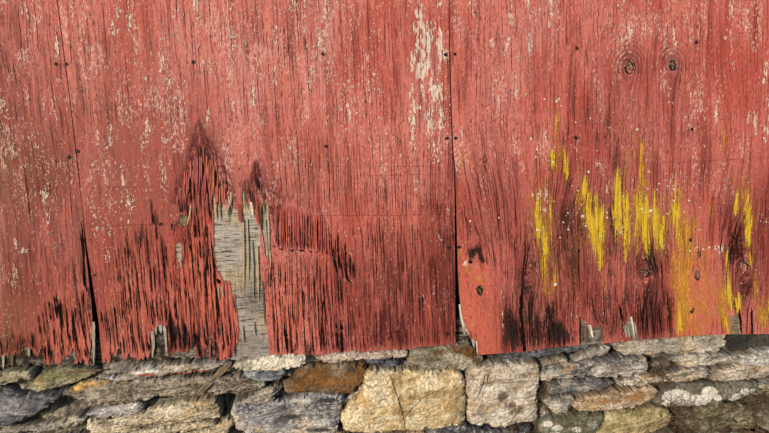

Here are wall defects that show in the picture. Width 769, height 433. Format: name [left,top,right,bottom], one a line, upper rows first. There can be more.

peeling [23,119,52,234]
crack [0,1,237,361]
peeling [396,0,450,190]
leakage [503,109,769,353]